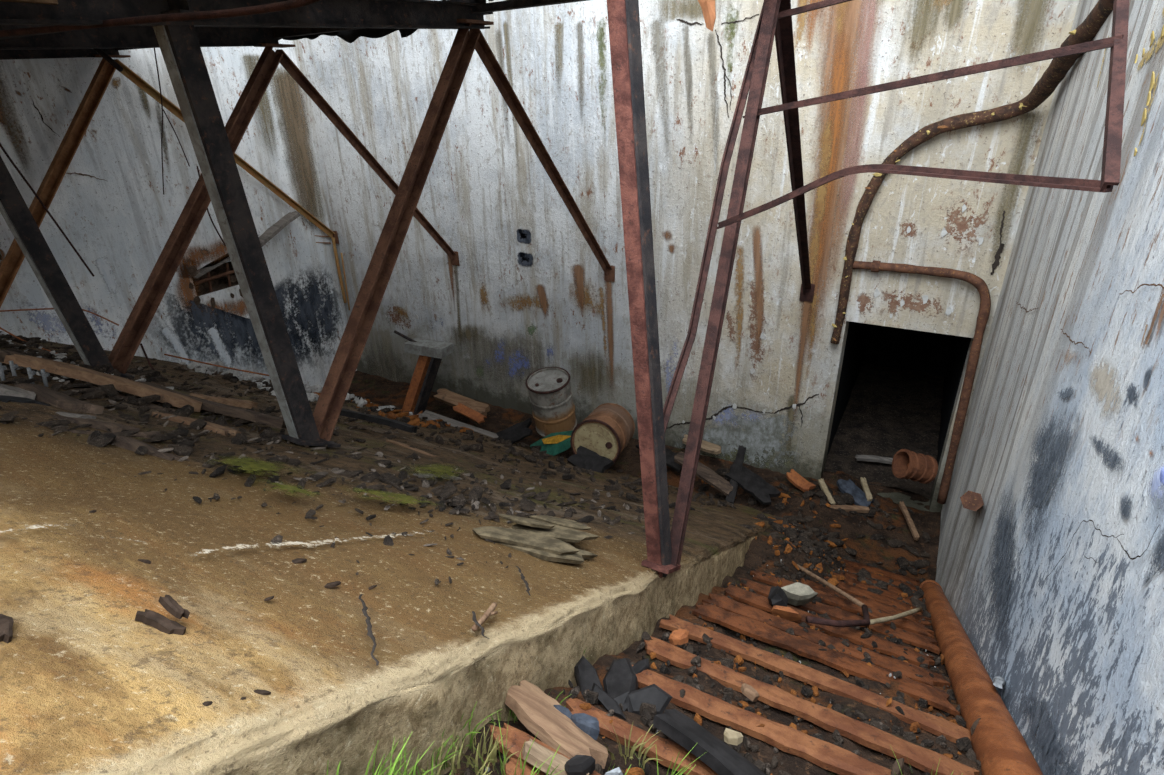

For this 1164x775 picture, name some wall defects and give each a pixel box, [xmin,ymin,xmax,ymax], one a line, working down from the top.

water stain [597,21,607,116]
water stain [257,69,324,224]
rust [795,0,877,412]
peeling [941,201,988,249]
spalling [176,239,248,318]
water stain [162,298,266,367]
rust [508,285,550,316]
rust [570,265,614,381]
peeling [856,288,952,319]
crack [667,394,819,429]
crack [1045,520,1160,579]
crack [359,594,379,665]